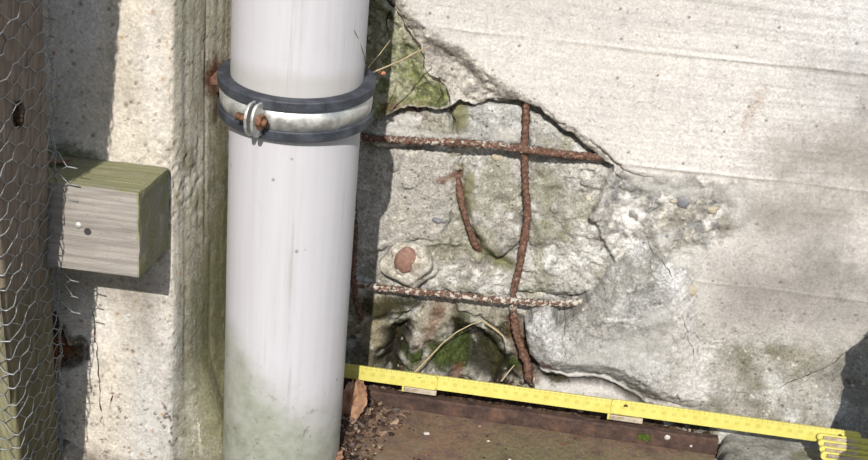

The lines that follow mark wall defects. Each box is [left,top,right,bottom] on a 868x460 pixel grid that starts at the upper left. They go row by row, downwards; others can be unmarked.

corrosion [53,323,77,383]
crack [92,312,113,422]
corrosion [350,102,603,383]
spalling [345,0,743,388]